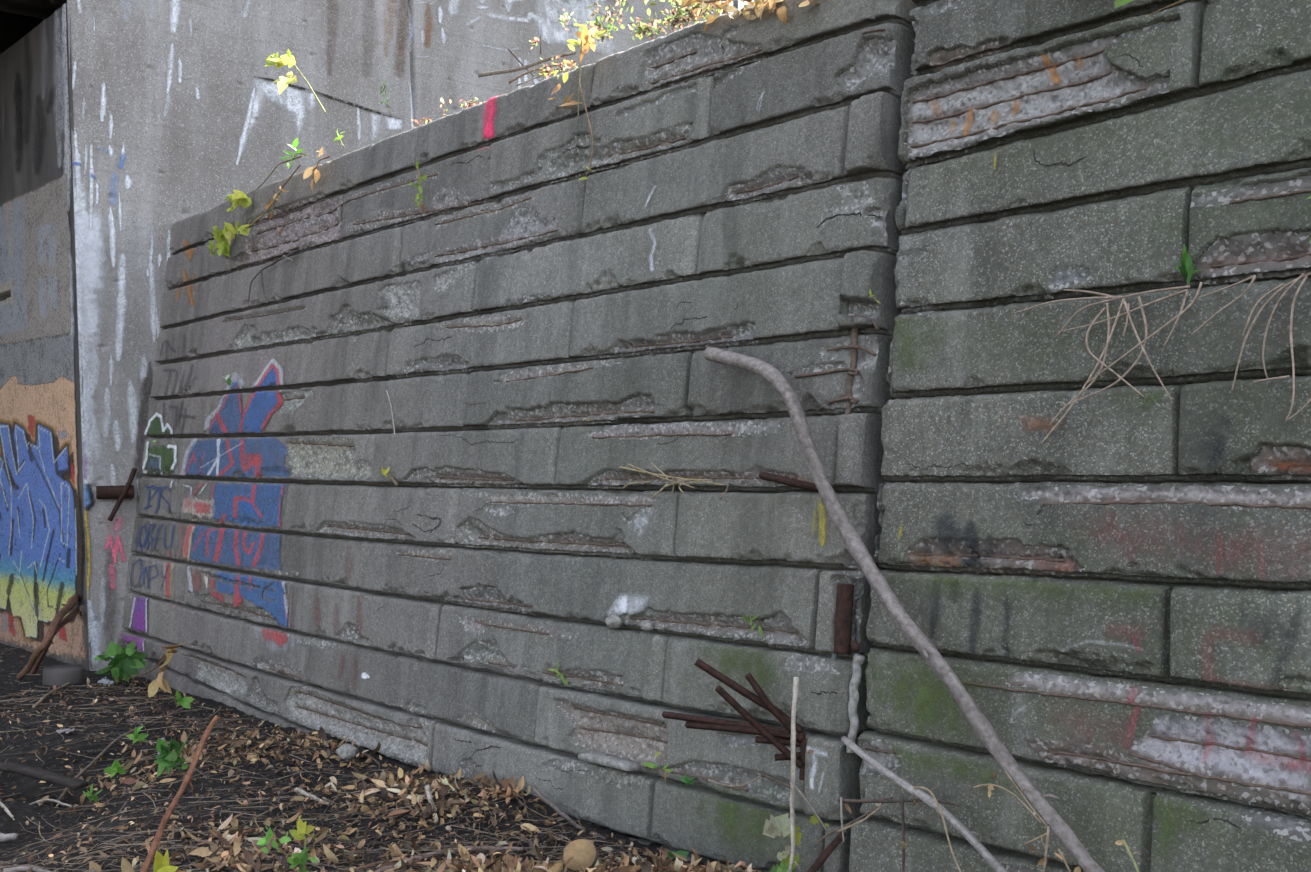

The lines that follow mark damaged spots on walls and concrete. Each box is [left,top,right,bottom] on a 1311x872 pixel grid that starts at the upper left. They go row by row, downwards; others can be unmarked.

spalling [818,0,1181,262]
spalling [223,123,694,354]
spalling [1194,230,1311,287]
spalling [487,394,784,441]
rust [107,468,137,521]
spalling [316,466,801,562]
spalling [906,539,1087,580]
spalling [1017,444,1311,510]
spalling [456,614,795,805]
rust [662,658,813,780]